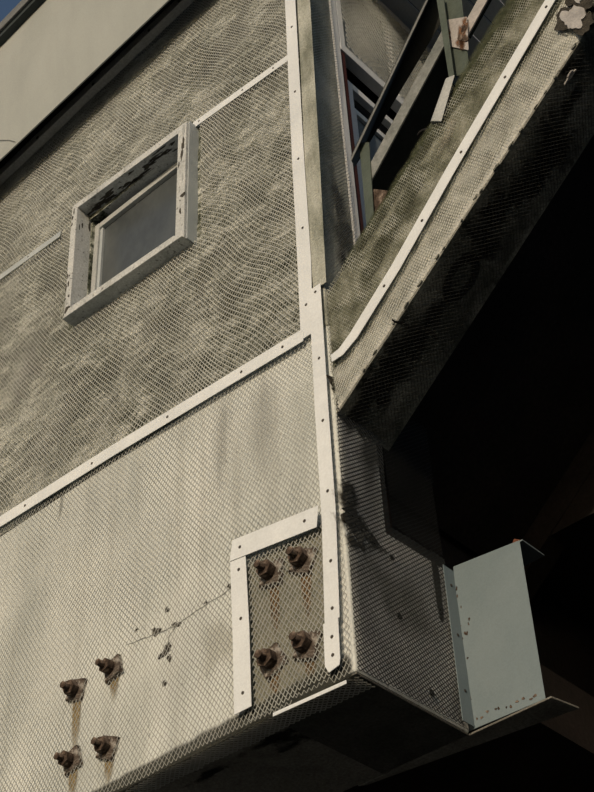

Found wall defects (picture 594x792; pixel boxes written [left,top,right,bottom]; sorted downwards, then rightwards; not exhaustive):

peeling [554,0,594,50]
damp [558,55,584,76]
peeling [71,125,185,232]
damp [344,87,583,426]
crack [130,588,231,644]
rust [72,701,81,742]